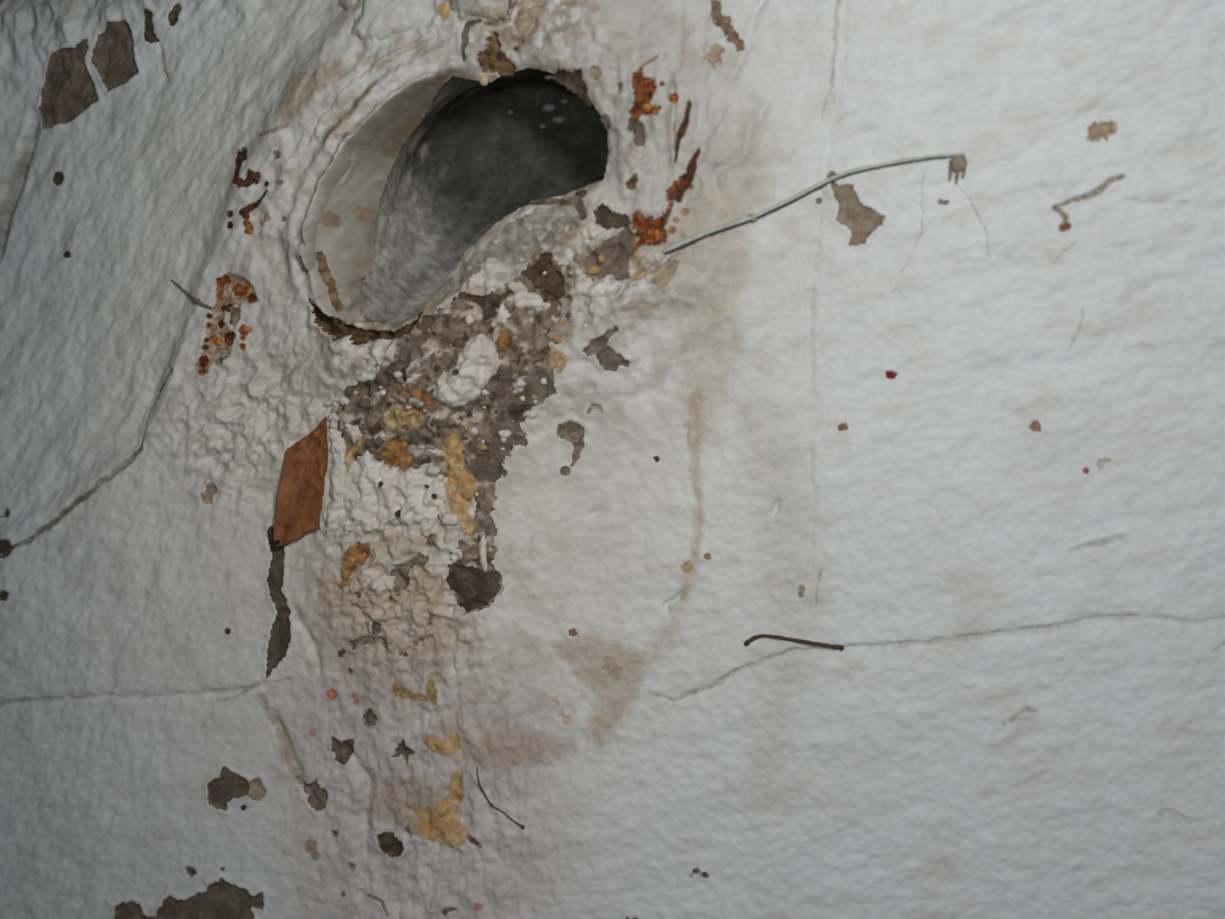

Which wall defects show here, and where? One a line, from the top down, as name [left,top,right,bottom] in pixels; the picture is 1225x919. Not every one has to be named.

peeling [38,8,159,129]
rust [227,147,286,234]
rust [627,55,701,254]
rust [196,272,257,376]
leakage [374,384,437,472]
spalling [299,189,640,615]
crack [0,440,144,559]
peeling [265,526,291,679]
leakage [340,543,370,587]
crack [657,682,719,700]
leakage [377,771,482,849]
peeling [113,867,264,919]